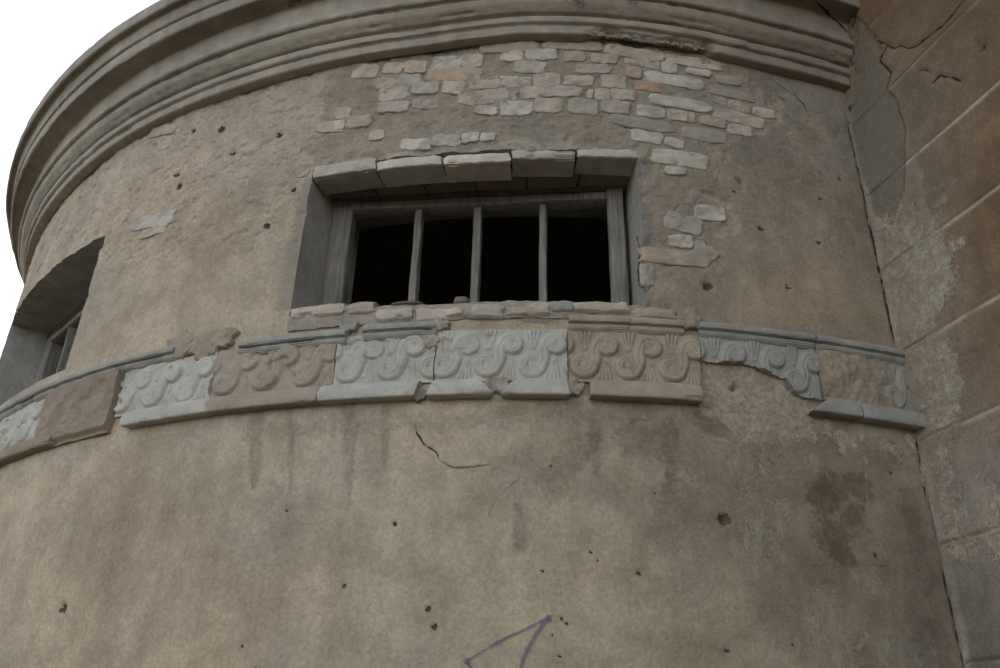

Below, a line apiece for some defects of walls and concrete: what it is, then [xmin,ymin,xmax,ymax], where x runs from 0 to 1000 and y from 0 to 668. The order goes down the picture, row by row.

spalling [291,31,778,308]
crack [816,0,962,340]
crack [415,425,489,468]
leakage [823,420,868,499]
leakage [871,151,1000,571]